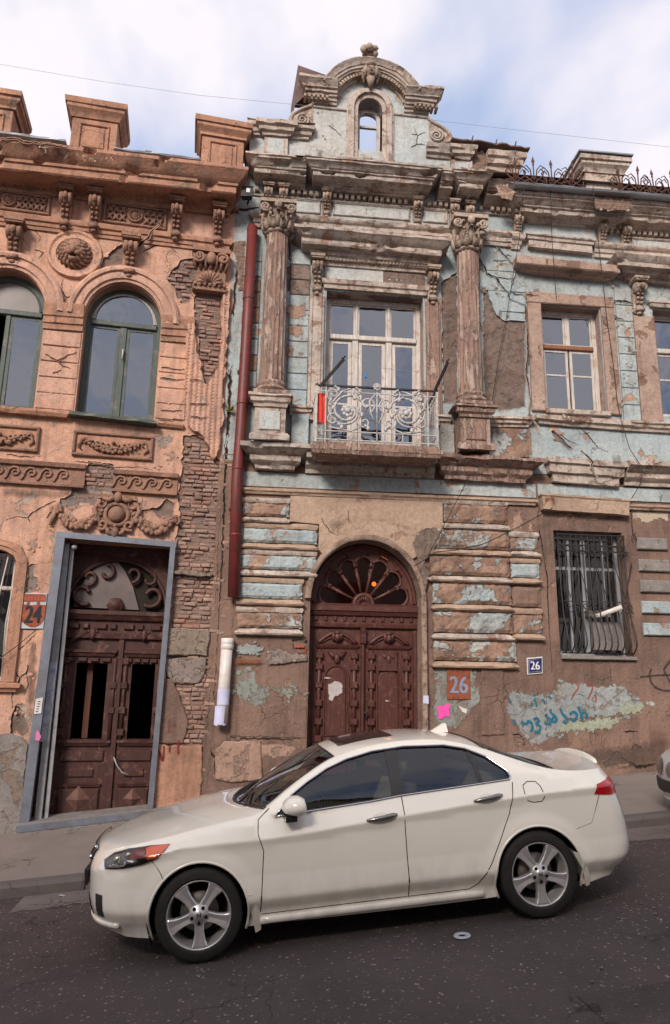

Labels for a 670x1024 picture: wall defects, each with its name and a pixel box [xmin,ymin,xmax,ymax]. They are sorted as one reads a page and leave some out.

crack [45,352,76,374]
flaking render [165,257,223,384]
peeling [285,264,309,357]
flaking render [479,262,527,412]
crack [479,246,613,493]
flaking render [141,433,309,795]
peeling [505,679,650,747]